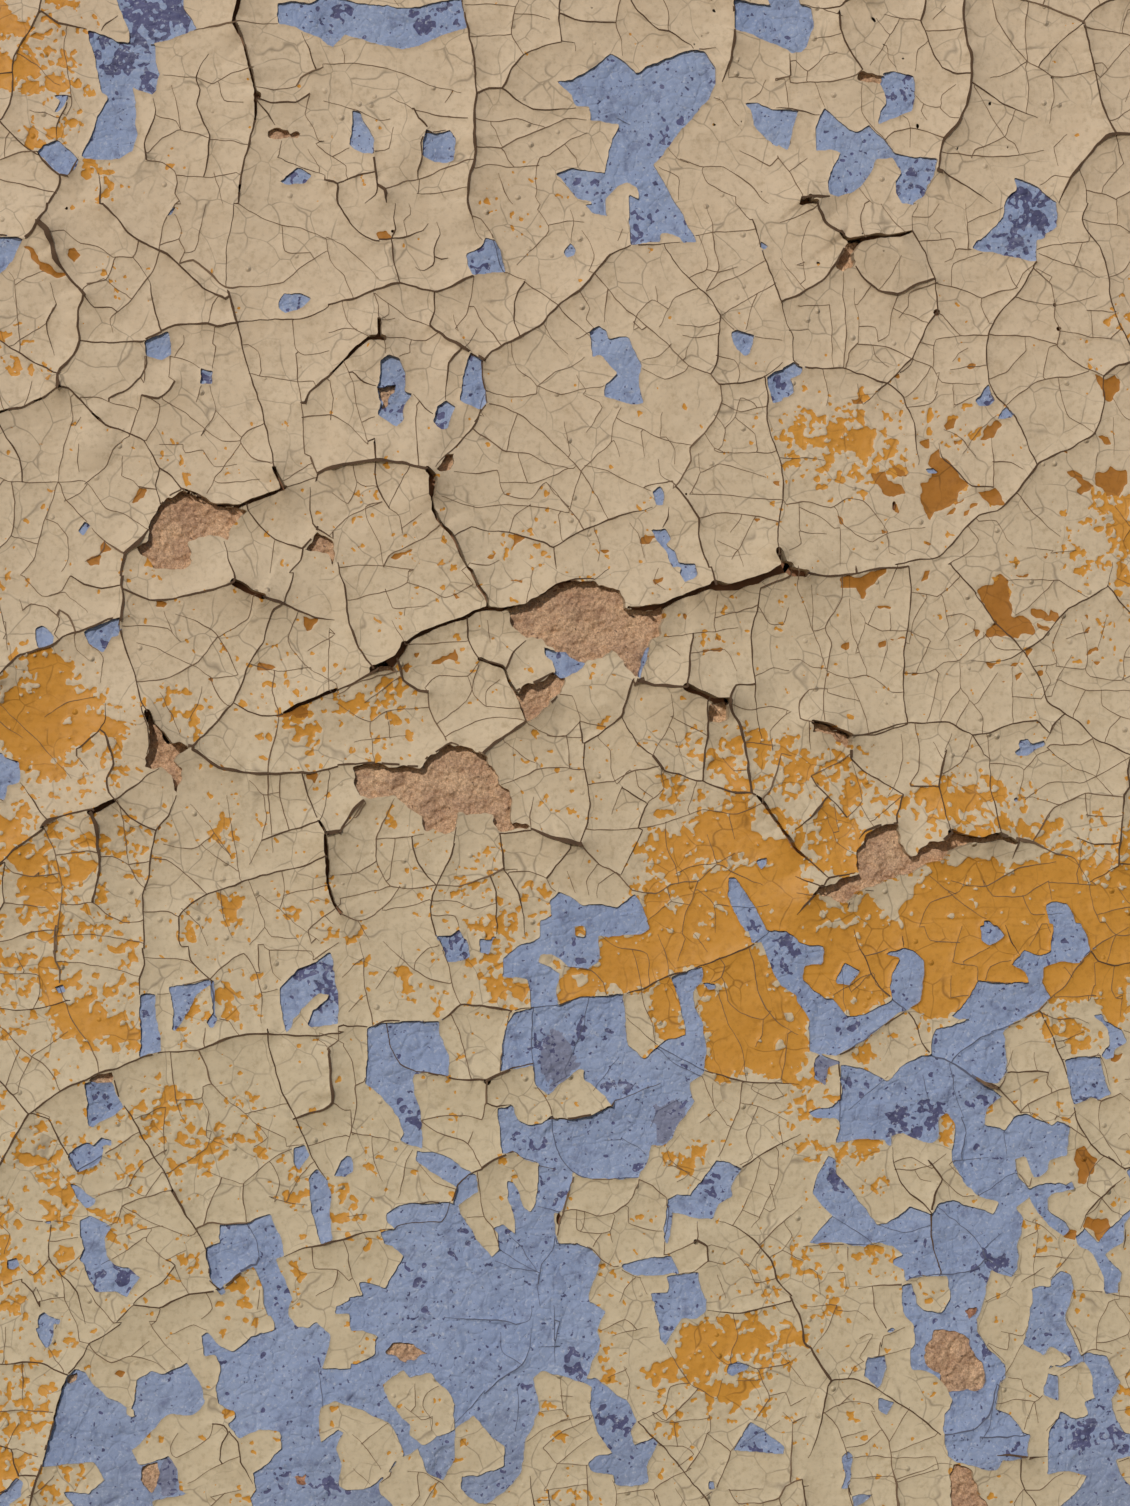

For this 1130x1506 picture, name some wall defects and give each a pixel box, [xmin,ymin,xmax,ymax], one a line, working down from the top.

peeling [277,0,466,49]
peeling [555,33,715,253]
crack [775,0,863,115]
crack [861,0,1038,203]
flaking render [65,431,245,582]
peeling [367,334,411,426]
peeling [731,312,1013,548]
crack [795,736,904,853]
peeling [0,466,1130,1506]
crack [835,887,1130,1229]
crack [598,931,1043,1506]
crack [0,1381,66,1506]